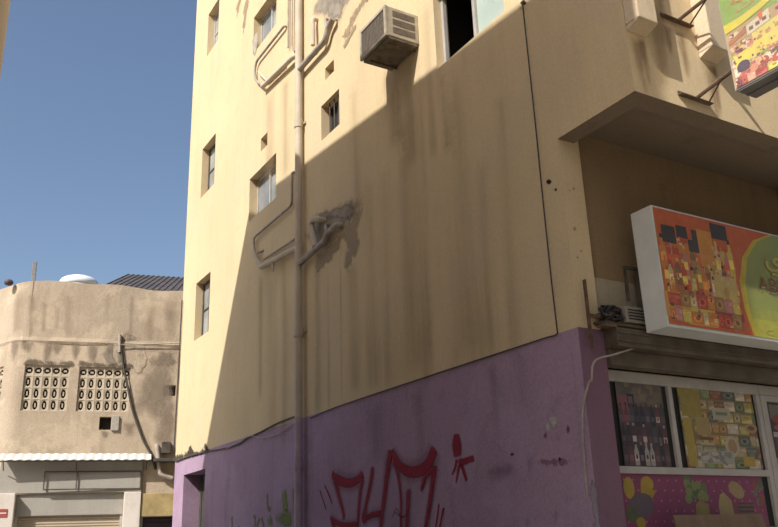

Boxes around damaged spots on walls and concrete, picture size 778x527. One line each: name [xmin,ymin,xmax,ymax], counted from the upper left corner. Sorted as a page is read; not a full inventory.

peeling [342,0,368,48]
leakage [24,343,133,368]